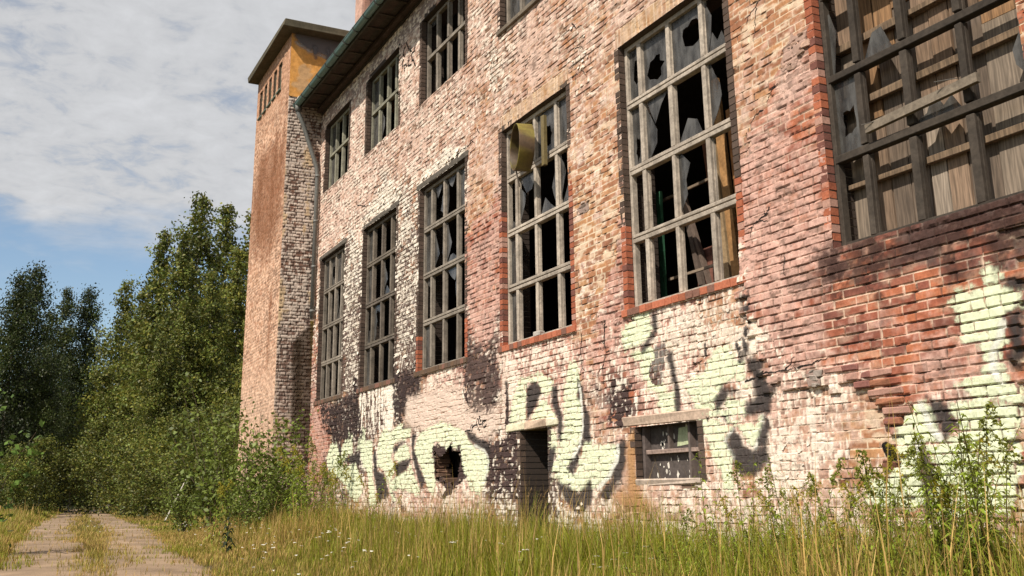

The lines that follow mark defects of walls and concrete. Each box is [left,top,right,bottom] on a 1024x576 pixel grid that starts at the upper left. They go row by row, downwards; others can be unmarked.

peeling [405,352,507,499]